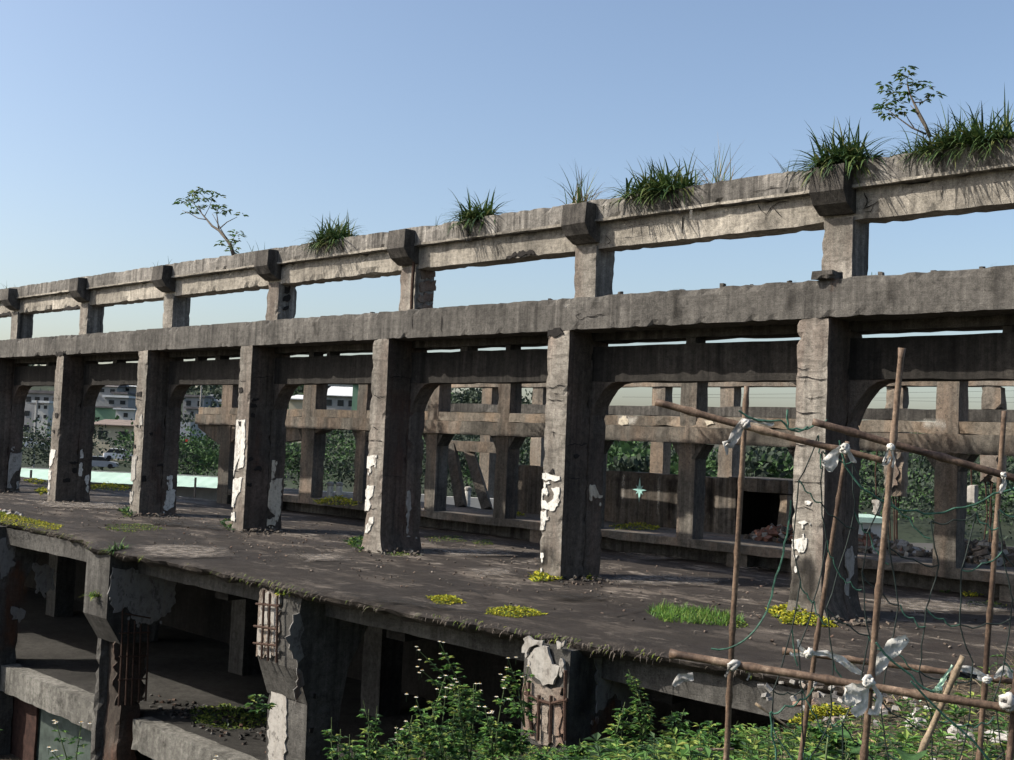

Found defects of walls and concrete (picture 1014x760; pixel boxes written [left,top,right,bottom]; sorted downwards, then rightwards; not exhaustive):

peeling [129,444,147,504]
peeling [157,463,176,513]
peeling [231,387,283,528]
peeling [365,455,377,533]
peeling [540,469,560,530]
peeling [107,567,177,707]
spalling [253,588,305,760]
spalling [522,636,569,747]